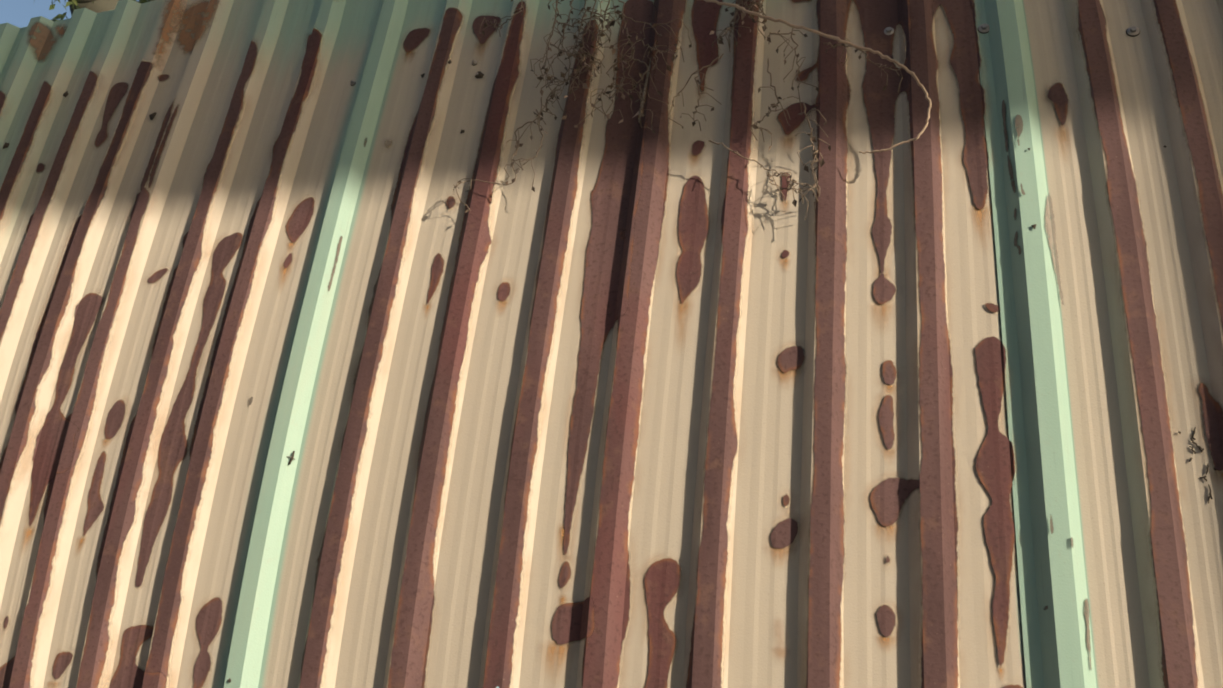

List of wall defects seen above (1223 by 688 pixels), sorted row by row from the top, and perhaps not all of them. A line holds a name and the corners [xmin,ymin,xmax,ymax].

corrosion [0,0,322,688]
corrosion [300,2,526,688]
corrosion [483,0,759,688]
corrosion [770,0,988,688]
corrosion [975,337,1023,688]
corrosion [1077,0,1198,688]
corrosion [1153,0,1223,326]
corrosion [1199,383,1223,477]